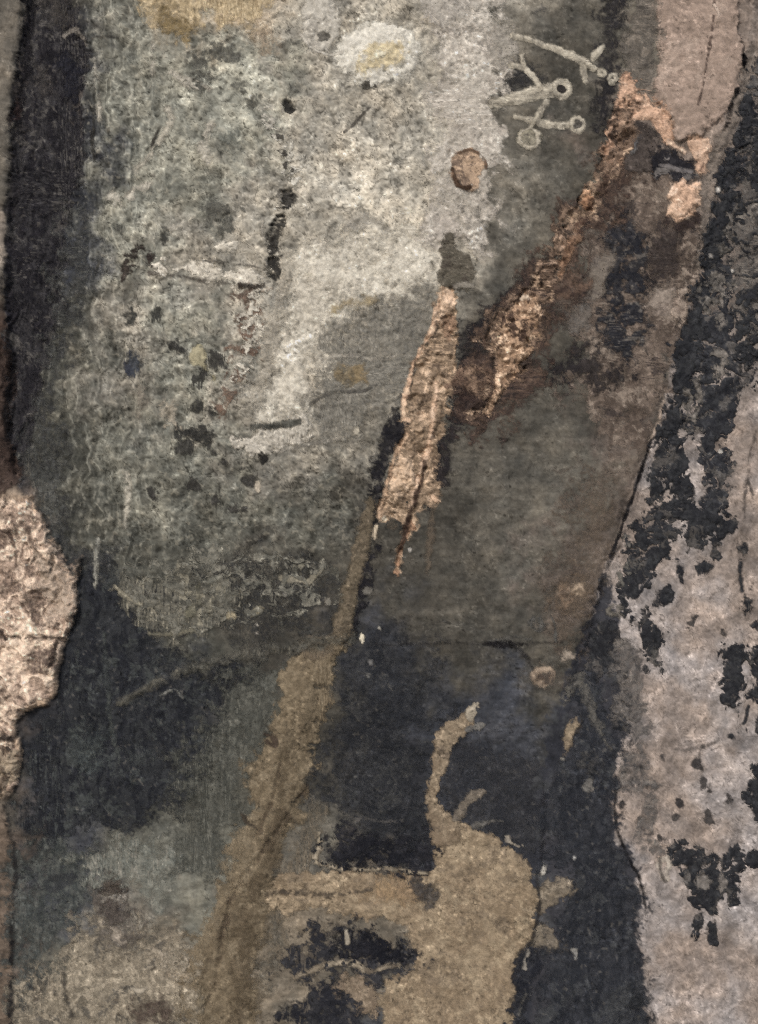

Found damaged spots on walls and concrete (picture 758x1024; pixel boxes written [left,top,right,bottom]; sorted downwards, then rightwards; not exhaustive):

flaking render [437,232,477,292]
crack [599,400,665,590]
peeling [579,0,758,946]
spalling [0,497,81,799]